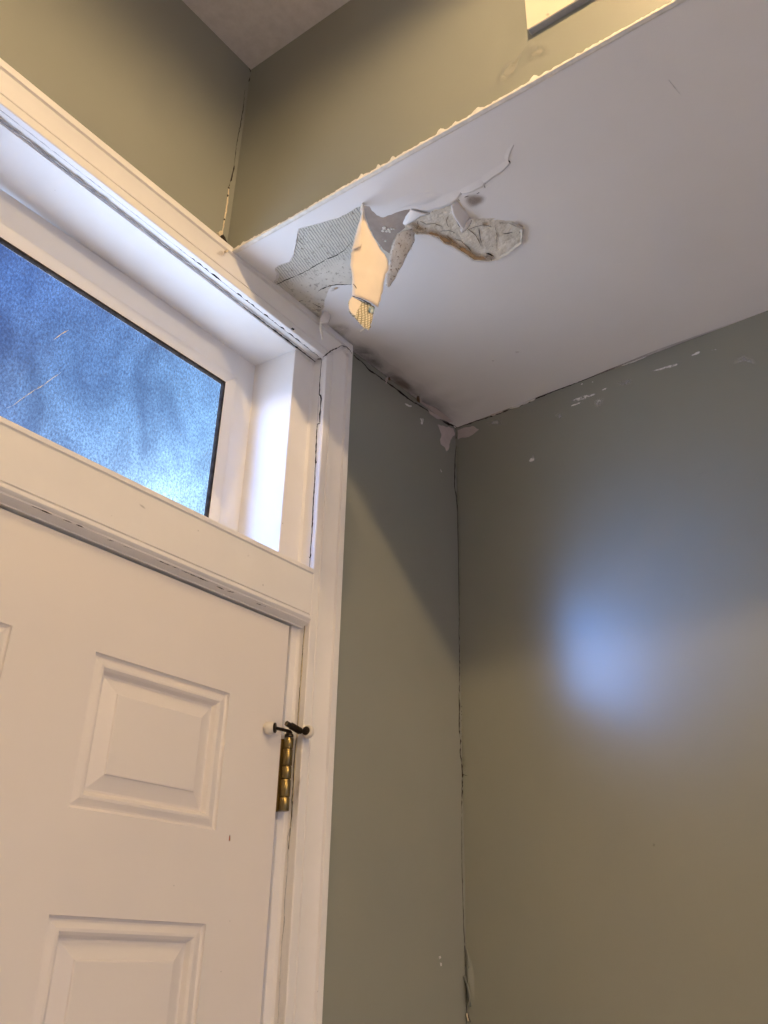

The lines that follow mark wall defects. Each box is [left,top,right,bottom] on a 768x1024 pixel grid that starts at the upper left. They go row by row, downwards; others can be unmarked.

crack [222,68,251,231]
peeling [232,0,687,340]
crack [0,110,458,567]
peeling [417,355,649,451]
crack [459,614,467,825]